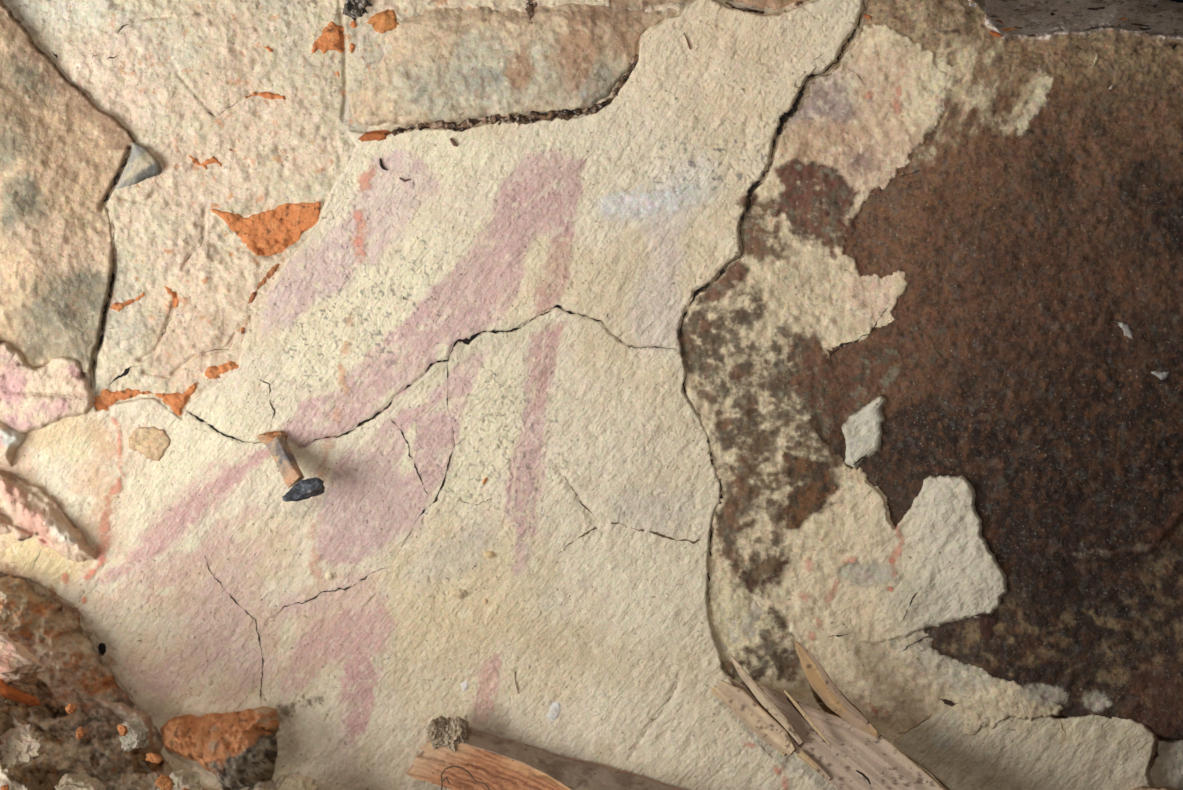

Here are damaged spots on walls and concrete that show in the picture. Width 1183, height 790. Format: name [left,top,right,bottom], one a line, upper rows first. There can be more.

crack [205,1,866,704]
crack [827,310,886,359]
crack [186,380,276,444]